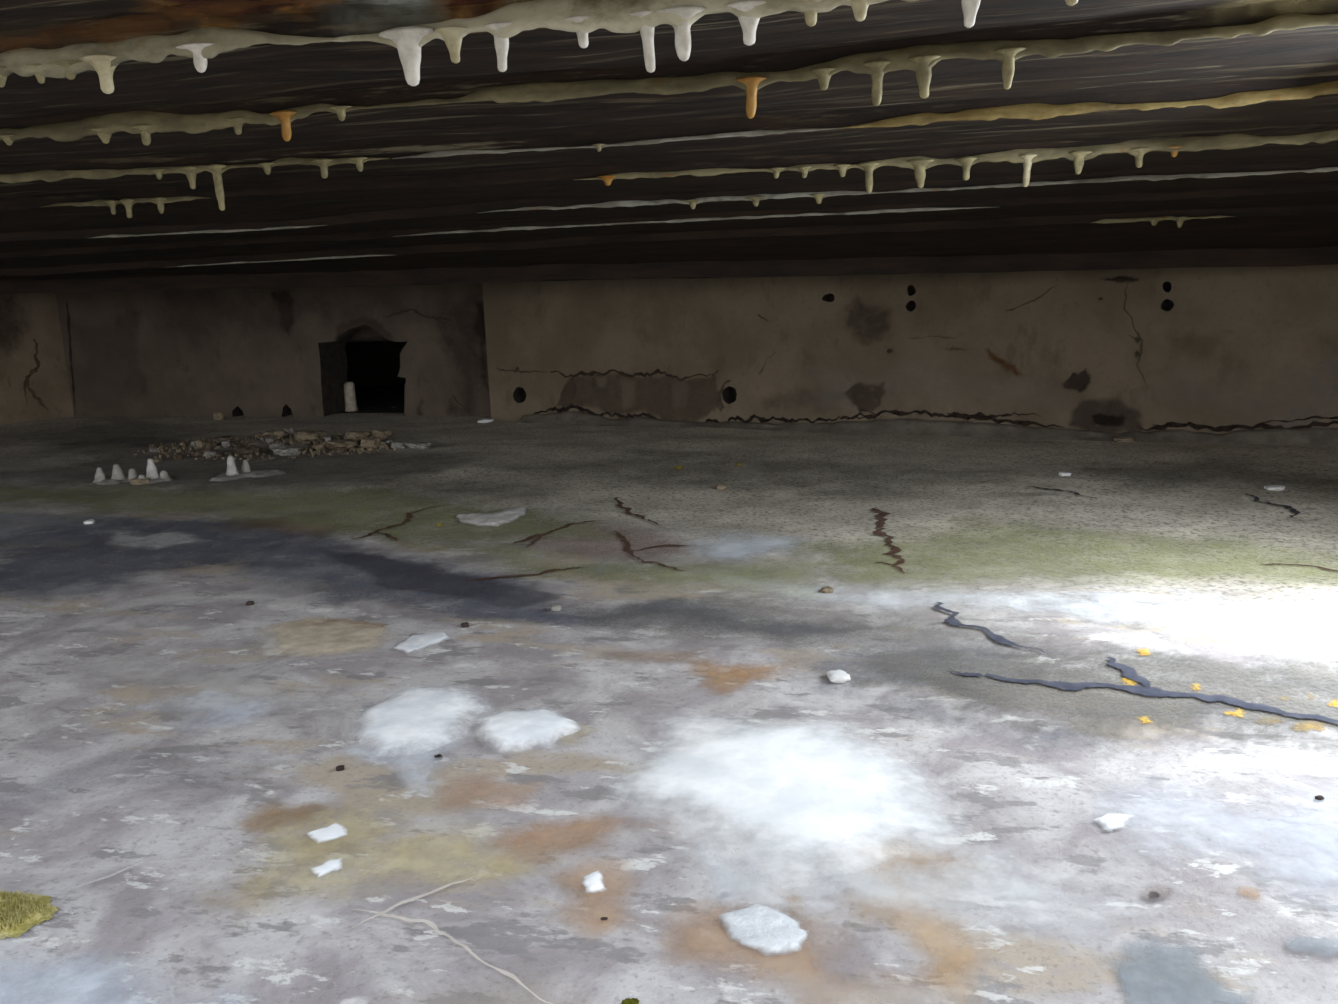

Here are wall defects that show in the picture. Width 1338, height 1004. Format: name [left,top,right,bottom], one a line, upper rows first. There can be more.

rust [439,0,502,19]
leakage [414,0,887,47]
leakage [0,13,1338,142]
leakage [0,81,1338,183]
leakage [392,167,1338,237]
crack [704,409,1065,428]
crack [1139,416,1338,432]
crack [465,497,691,582]
crack [871,507,912,574]
leakage [0,514,1338,748]
crack [934,602,1338,724]
leakage [354,688,593,782]